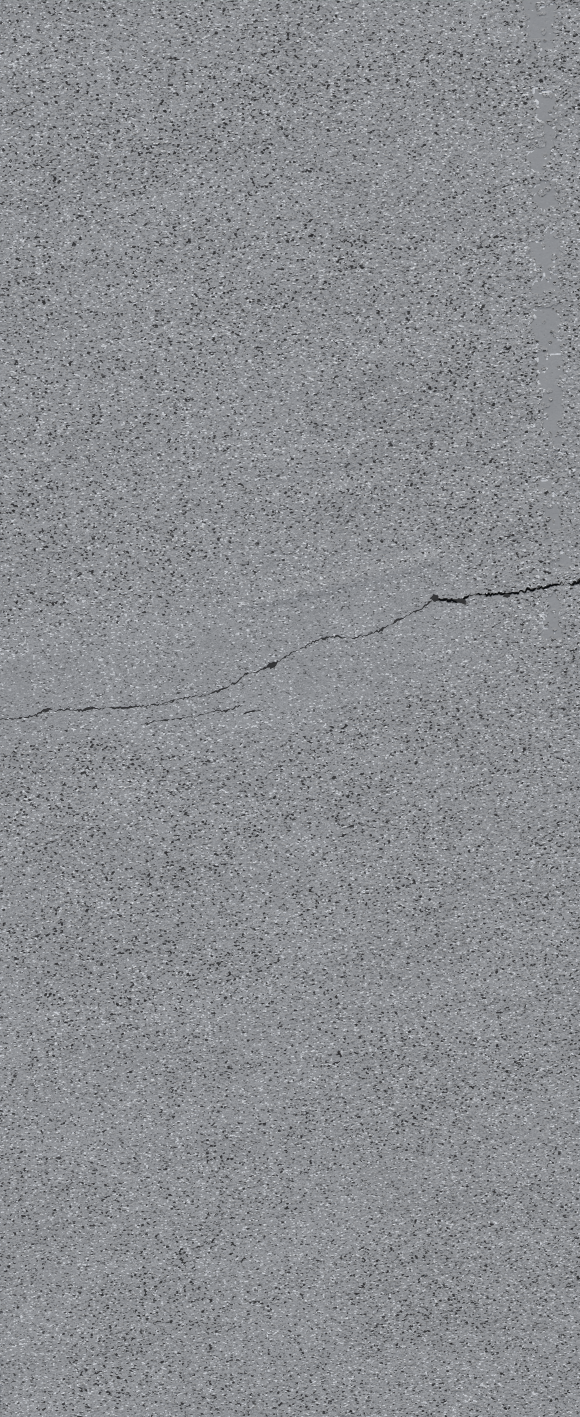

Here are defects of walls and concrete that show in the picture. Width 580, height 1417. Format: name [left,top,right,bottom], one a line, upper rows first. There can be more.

crack [0,579,580,724]